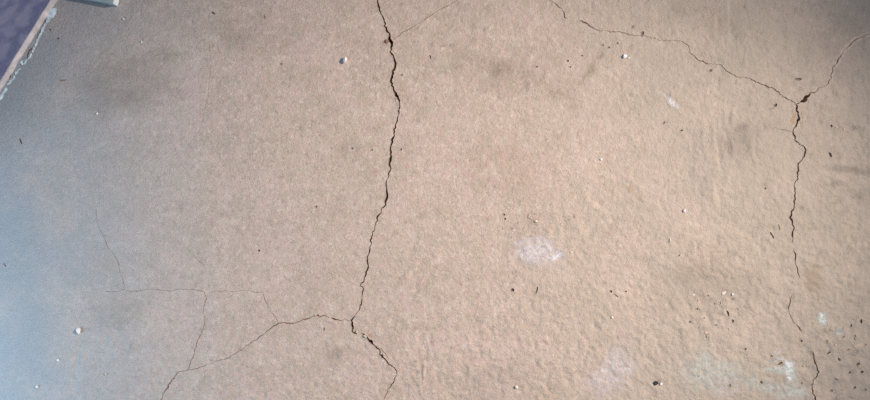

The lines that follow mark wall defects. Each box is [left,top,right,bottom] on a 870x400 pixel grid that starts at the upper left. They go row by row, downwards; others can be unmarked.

crack [96,0,458,400]
crack [550,0,870,333]
crack [811,351,819,400]